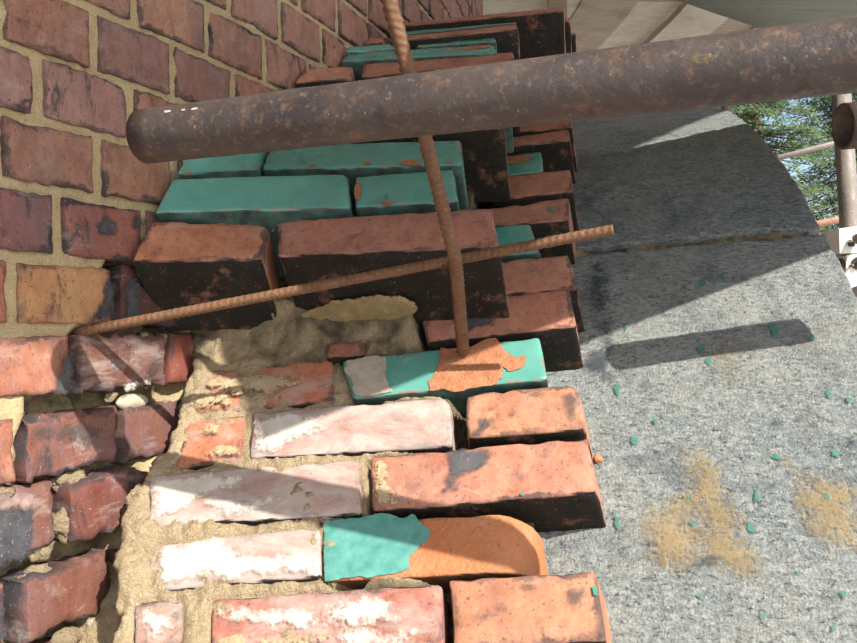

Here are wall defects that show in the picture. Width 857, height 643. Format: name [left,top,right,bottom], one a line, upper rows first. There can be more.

water stain [255,413,322,452]
water stain [151,472,280,519]
water stain [160,538,320,582]
water stain [142,609,172,637]
water stain [219,608,315,628]
water stain [326,597,415,643]